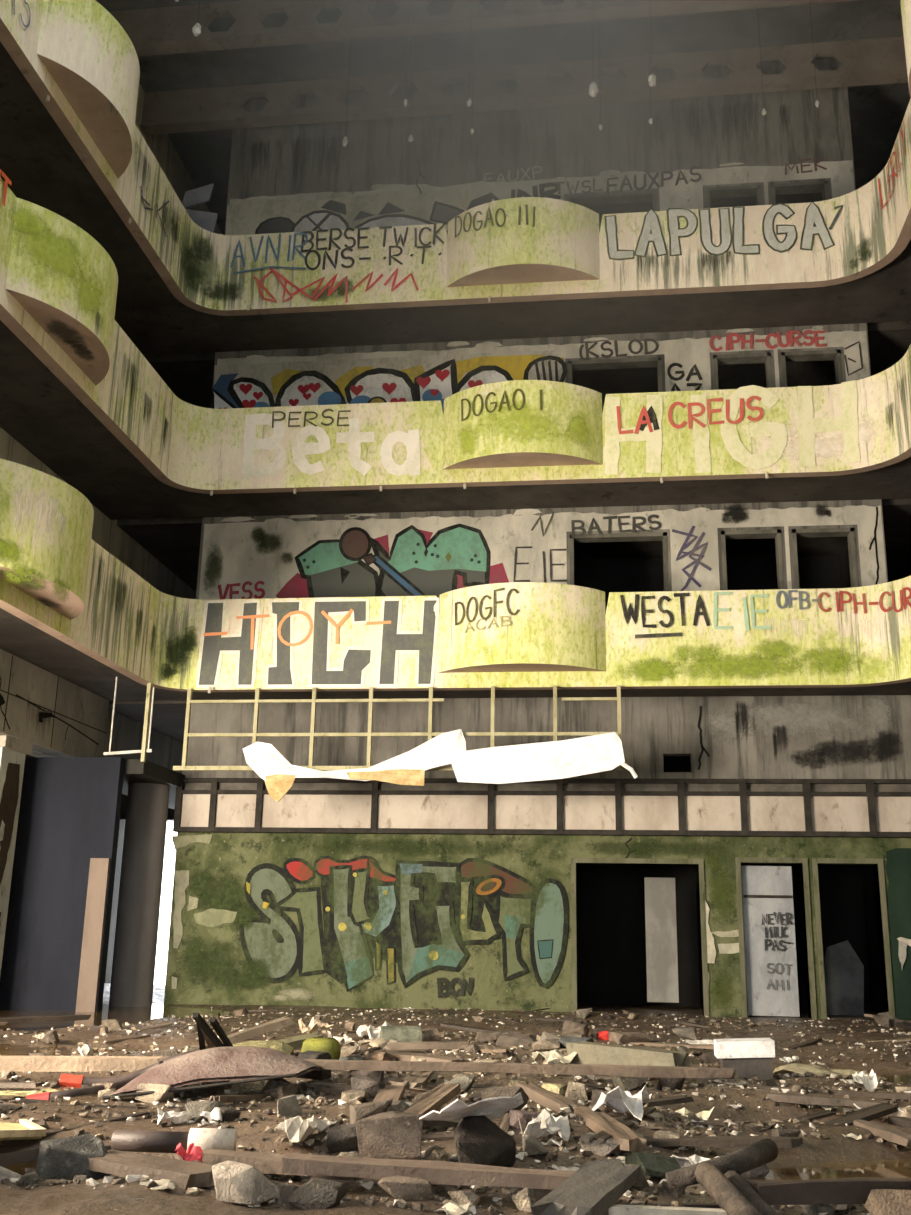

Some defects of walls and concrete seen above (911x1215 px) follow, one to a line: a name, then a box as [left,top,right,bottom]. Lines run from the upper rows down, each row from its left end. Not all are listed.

damp [853,240,871,267]
damp [736,702,748,735]
damp [773,726,900,768]
peeling [897,937,911,968]